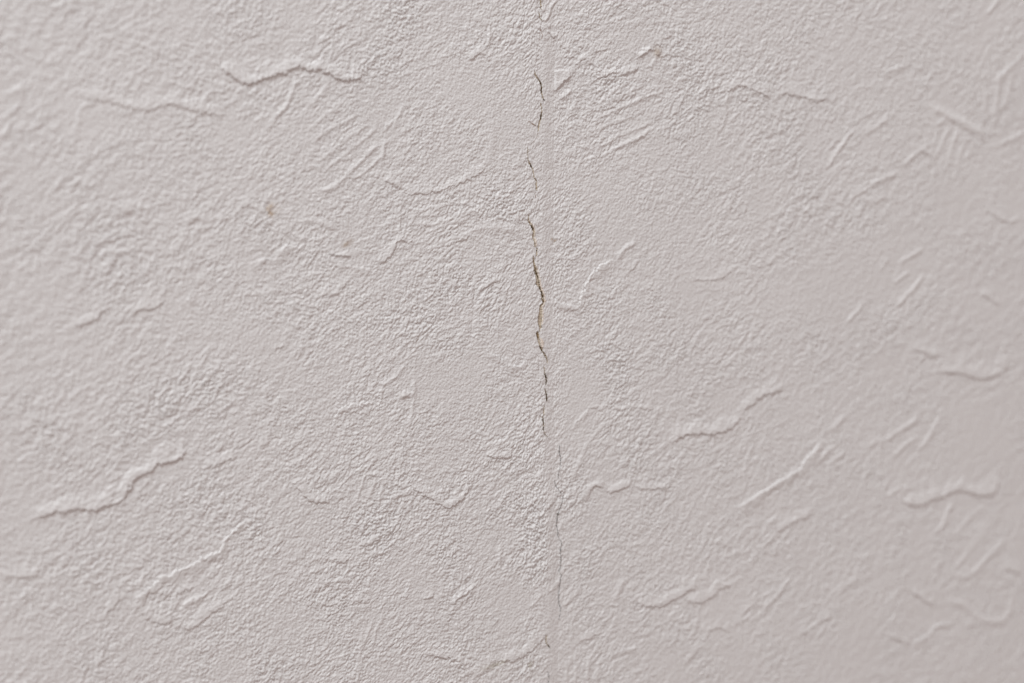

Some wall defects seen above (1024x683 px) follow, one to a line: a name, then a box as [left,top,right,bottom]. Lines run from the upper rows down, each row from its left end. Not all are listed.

crack [527,71,562,648]